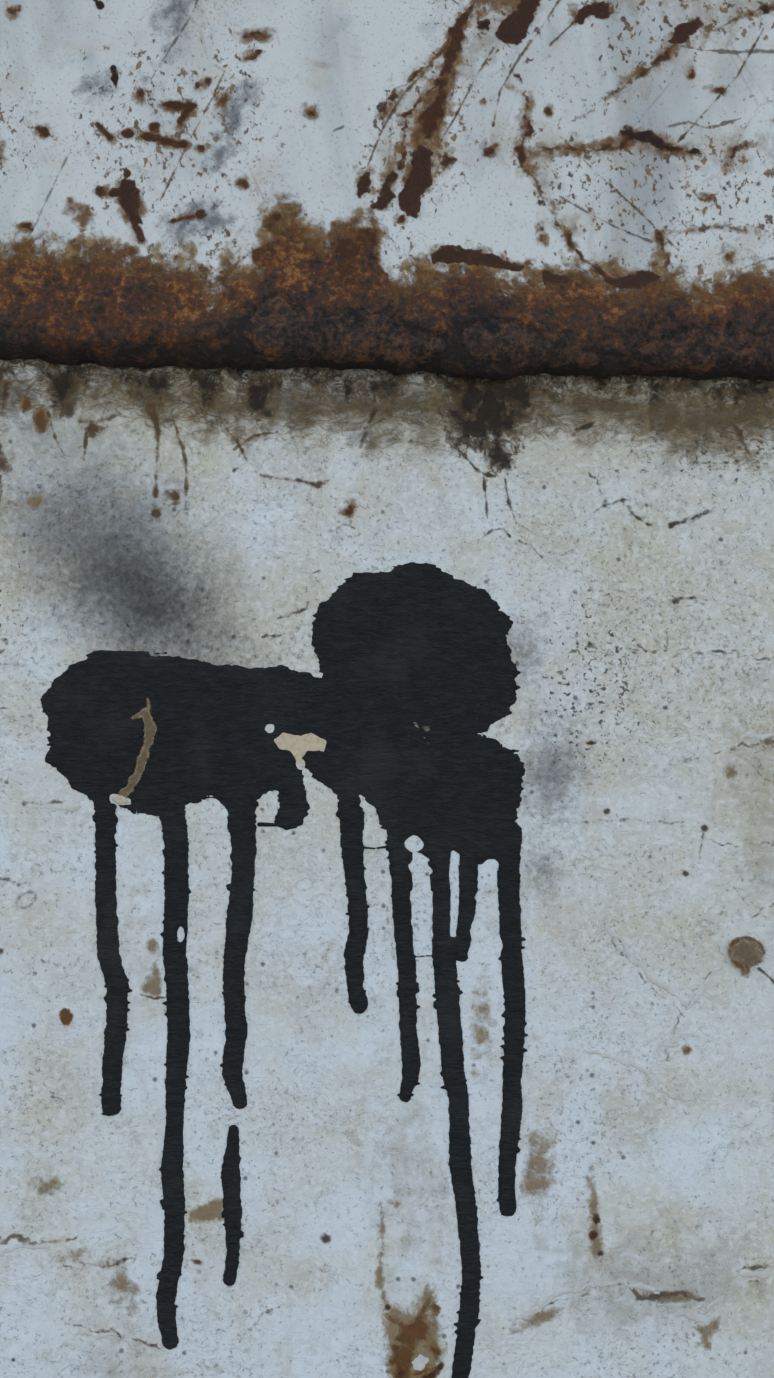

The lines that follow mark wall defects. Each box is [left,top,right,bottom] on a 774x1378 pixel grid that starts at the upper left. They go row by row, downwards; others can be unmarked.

rust [242,29,272,61]
rust [570,1,612,25]
rust [35,125,52,138]
rust [95,77,230,153]
rust [304,106,318,119]
rust [529,125,702,158]
rust [0,169,774,464]
rust [146,403,188,518]
water stain [0,367,511,538]
water stain [510,376,774,492]
rust [340,500,357,518]
rust [375,1252,444,1378]